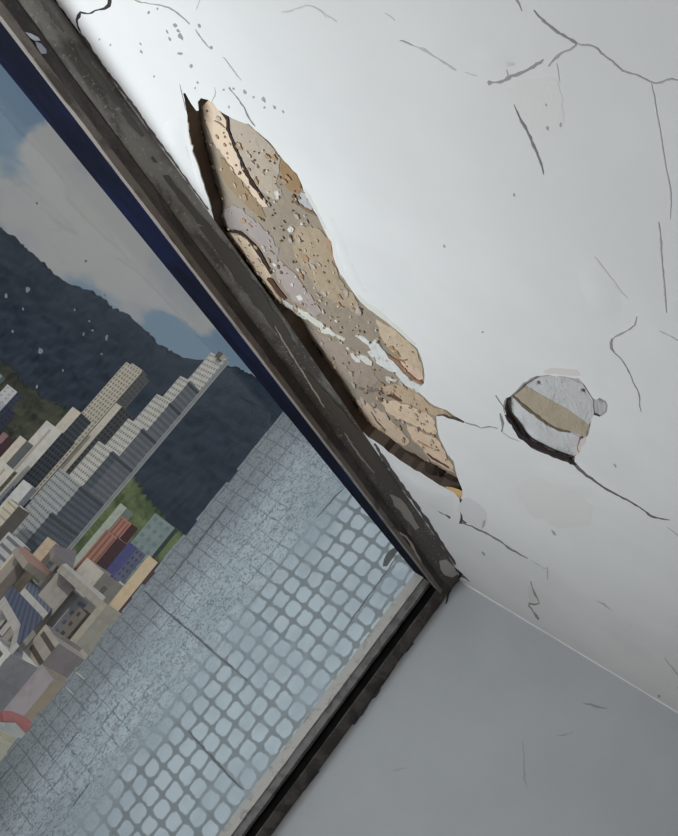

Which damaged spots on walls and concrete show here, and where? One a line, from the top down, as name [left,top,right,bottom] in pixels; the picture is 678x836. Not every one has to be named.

crack [76,0,112,32]
crack [135,0,269,207]
crack [400,0,678,341]
spalling [163,100,457,478]
peeling [302,371,420,530]
spalling [507,368,606,459]
crack [465,376,678,536]
crack [610,317,641,411]
crack [438,511,548,620]